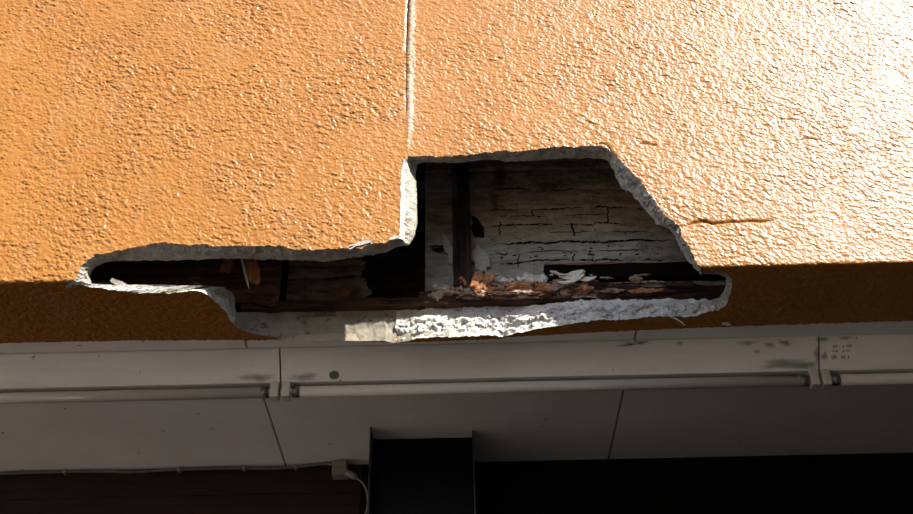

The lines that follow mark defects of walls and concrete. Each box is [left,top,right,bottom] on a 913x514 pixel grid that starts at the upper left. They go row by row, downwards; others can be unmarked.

spalling [65,146,732,343]
crack [490,187,775,267]